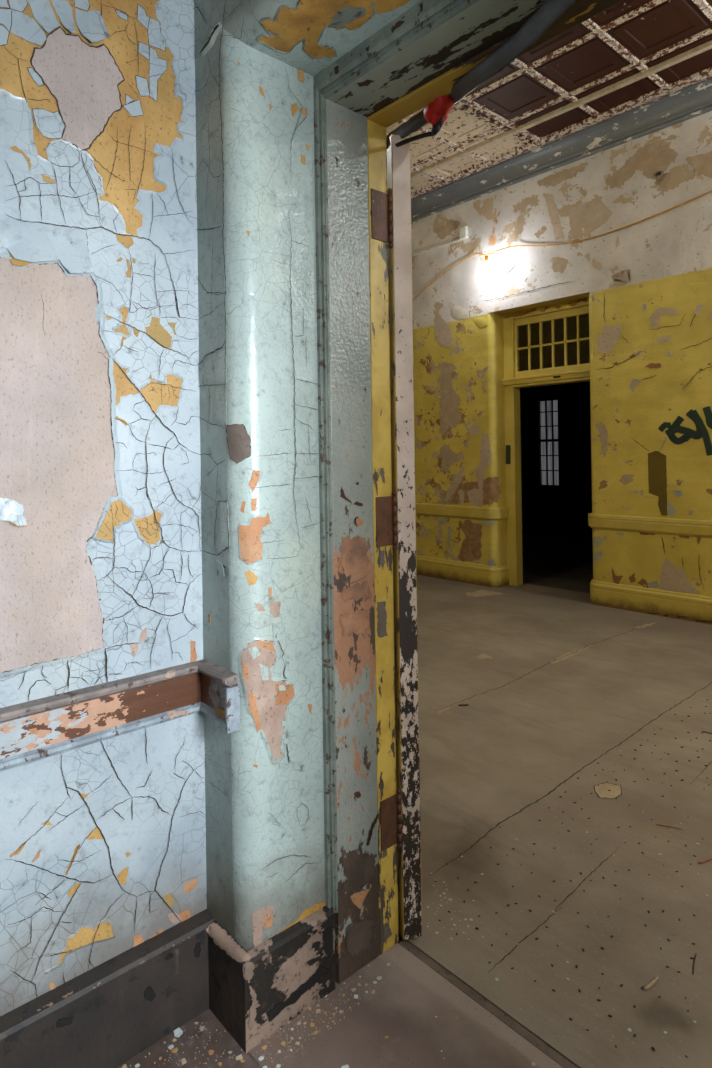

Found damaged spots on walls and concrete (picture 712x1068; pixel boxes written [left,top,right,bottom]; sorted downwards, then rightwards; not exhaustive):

peeling [255,0,423,74]
peeling [0,0,186,278]
peeling [606,144,712,188]
crack [5,0,244,702]
flaking render [0,218,184,679]
peeling [226,424,251,464]
peeling [437,362,501,507]
peeling [237,470,271,585]
peeling [208,637,296,769]
crack [7,732,225,999]
peeling [251,902,326,948]
peeling [242,926,401,1068]